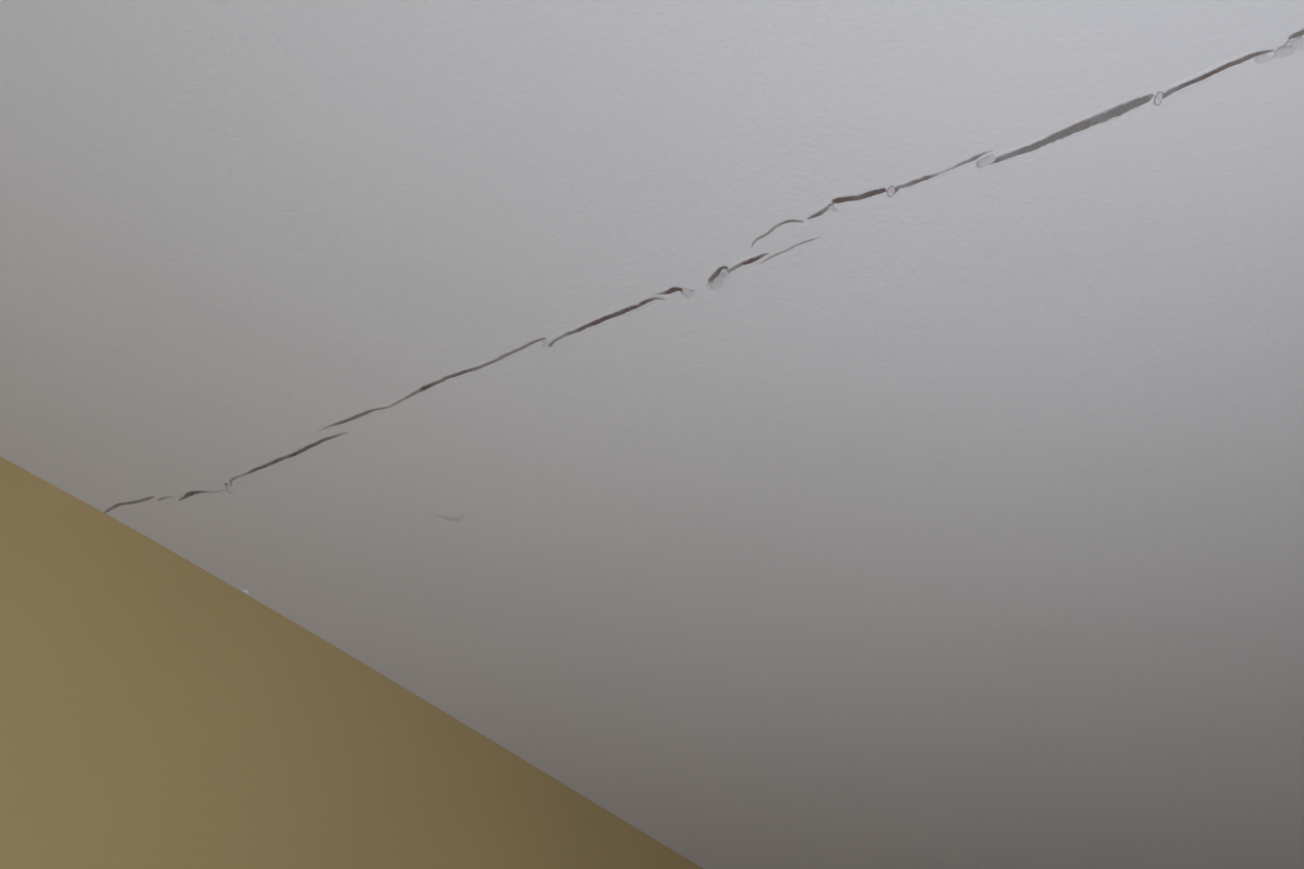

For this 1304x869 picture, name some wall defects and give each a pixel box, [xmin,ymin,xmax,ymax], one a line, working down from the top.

crack [786,24,1304,223]
crack [105,252,764,512]